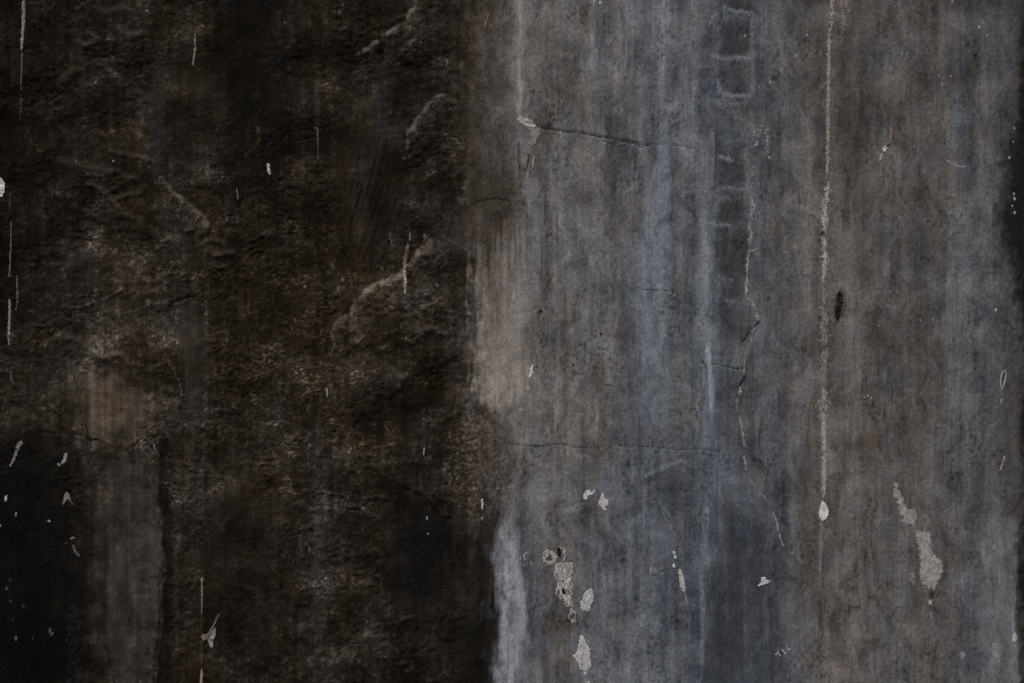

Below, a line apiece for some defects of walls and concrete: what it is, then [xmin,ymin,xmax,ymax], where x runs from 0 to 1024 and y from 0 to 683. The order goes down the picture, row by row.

crack [540,126,693,149]
leakage [796,0,862,500]
crack [502,195,784,547]
leakage [625,0,832,683]
flaking render [523,546,594,624]
flaking render [893,482,945,619]
flaking render [572,635,591,683]